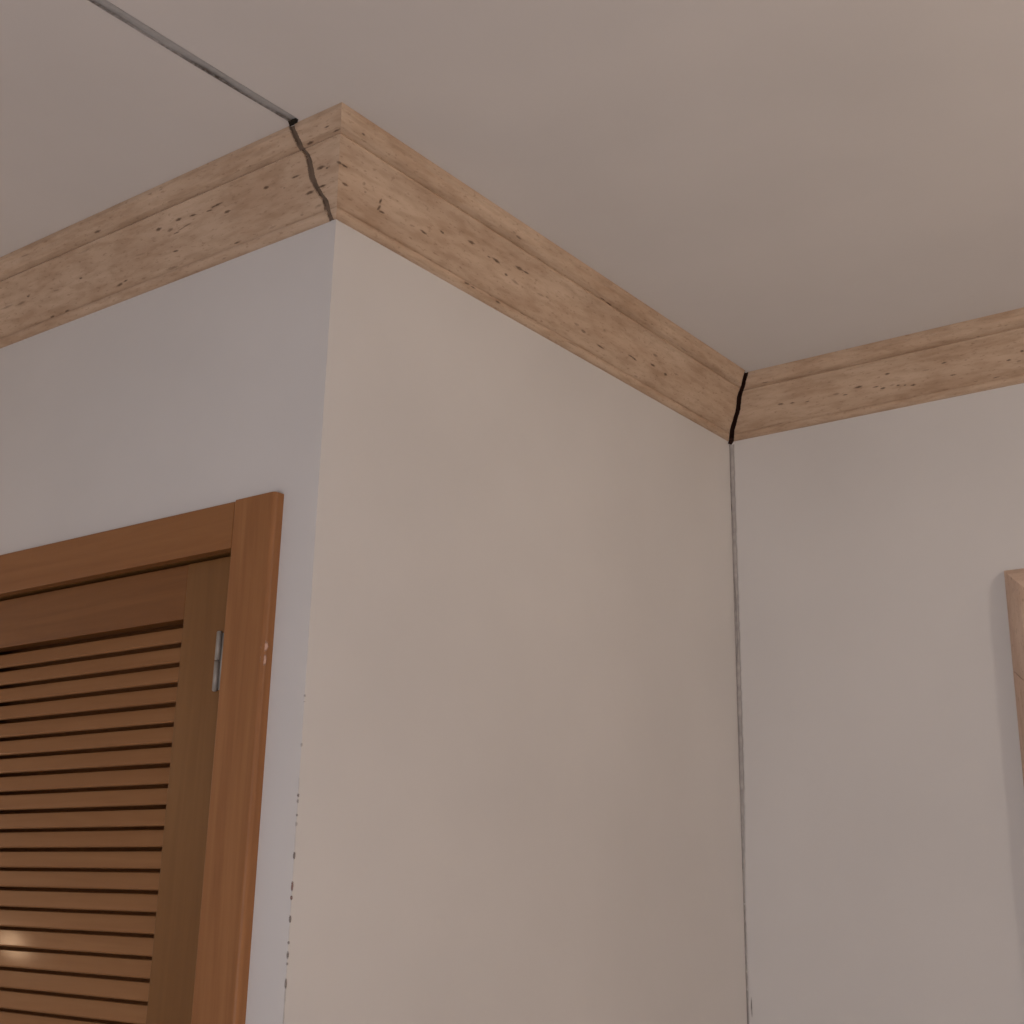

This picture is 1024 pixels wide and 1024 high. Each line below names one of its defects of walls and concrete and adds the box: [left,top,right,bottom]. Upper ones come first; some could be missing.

crack [88,0,334,221]
crack [728,372,752,1015]